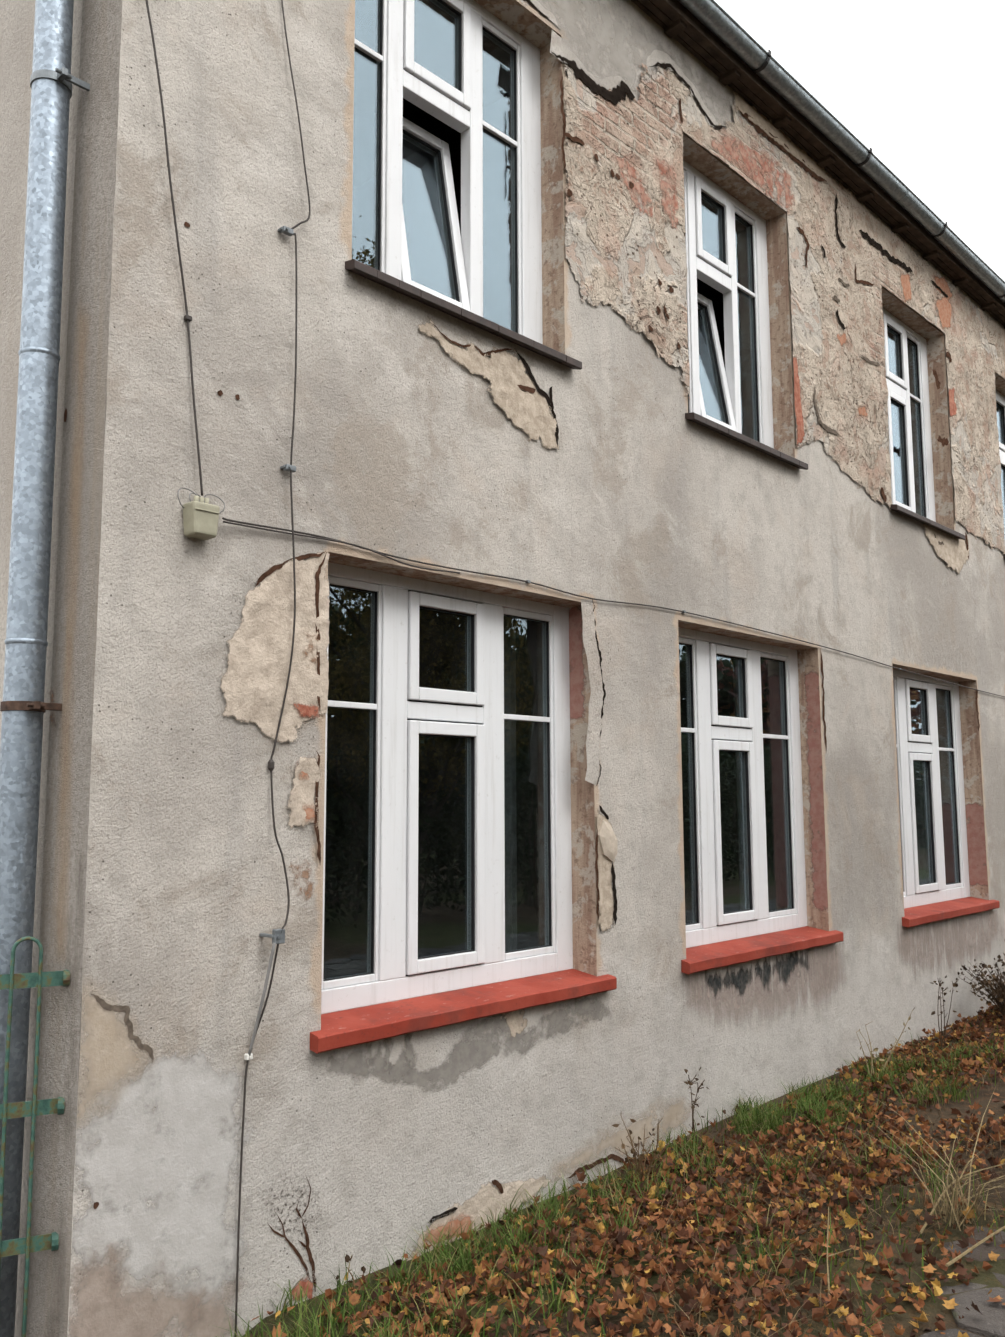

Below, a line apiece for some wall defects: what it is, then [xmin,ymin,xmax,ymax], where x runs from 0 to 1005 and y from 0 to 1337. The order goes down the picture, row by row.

spalling [419,310,570,452]
spalling [560,62,1005,574]
spalling [221,534,330,742]
spalling [287,751,321,863]